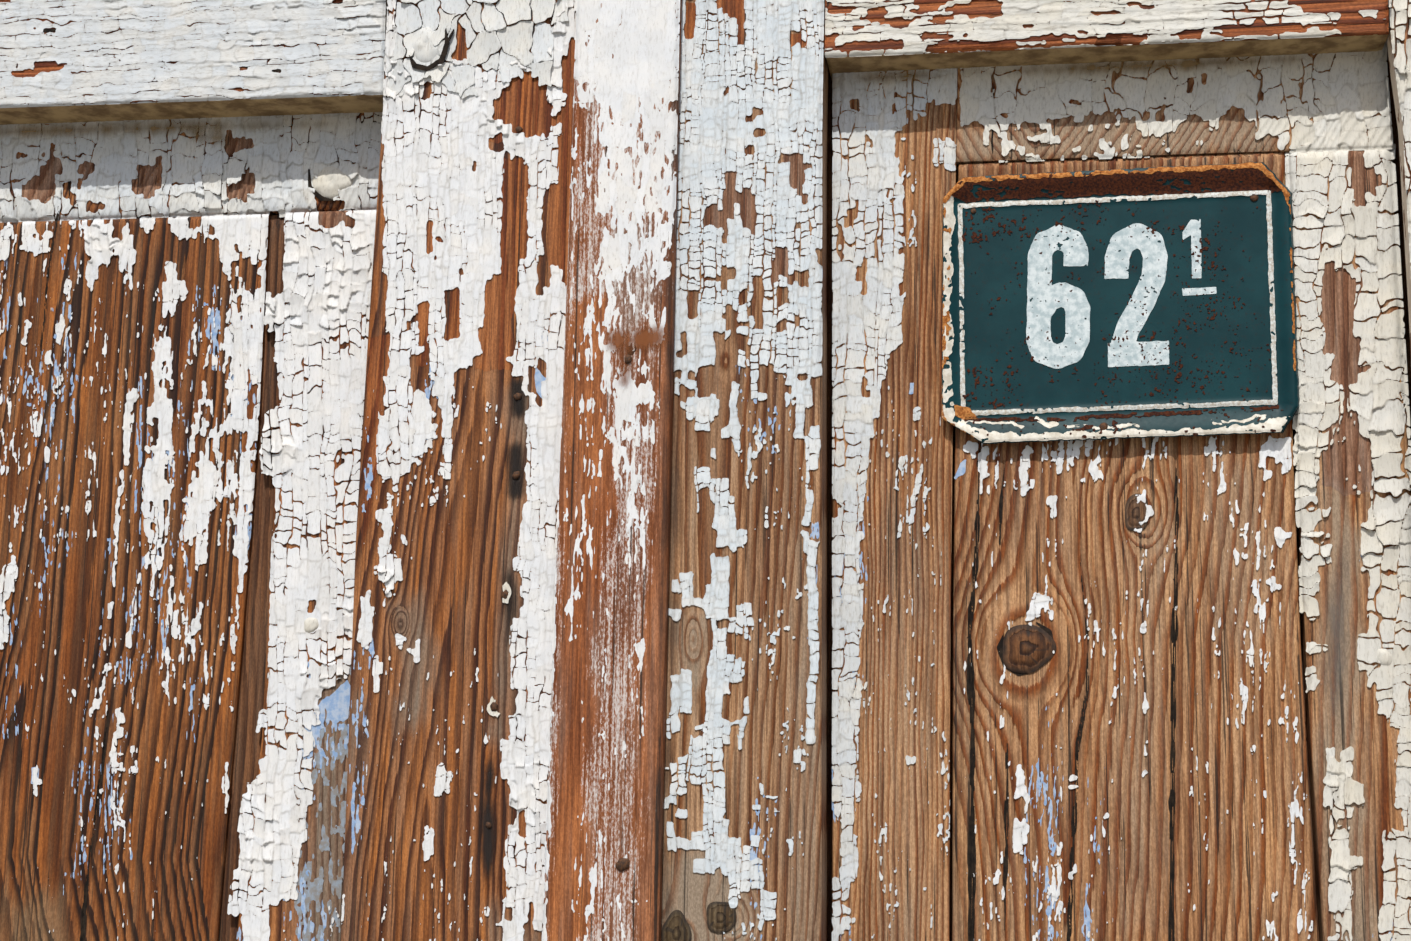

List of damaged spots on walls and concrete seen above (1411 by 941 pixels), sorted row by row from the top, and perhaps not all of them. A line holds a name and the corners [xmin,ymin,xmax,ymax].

crack [0,0,454,134]
crack [39,158,71,368]
crack [308,169,333,201]
rust [942,162,1291,438]
peeling [0,475,77,650]
peeling [664,448,796,940]
peeling [1007,538,1064,629]
peeling [954,438,1118,519]
peeling [1078,540,1176,724]
peeling [1250,642,1328,758]
peeling [973,745,1122,941]
peeling [1287,746,1365,941]